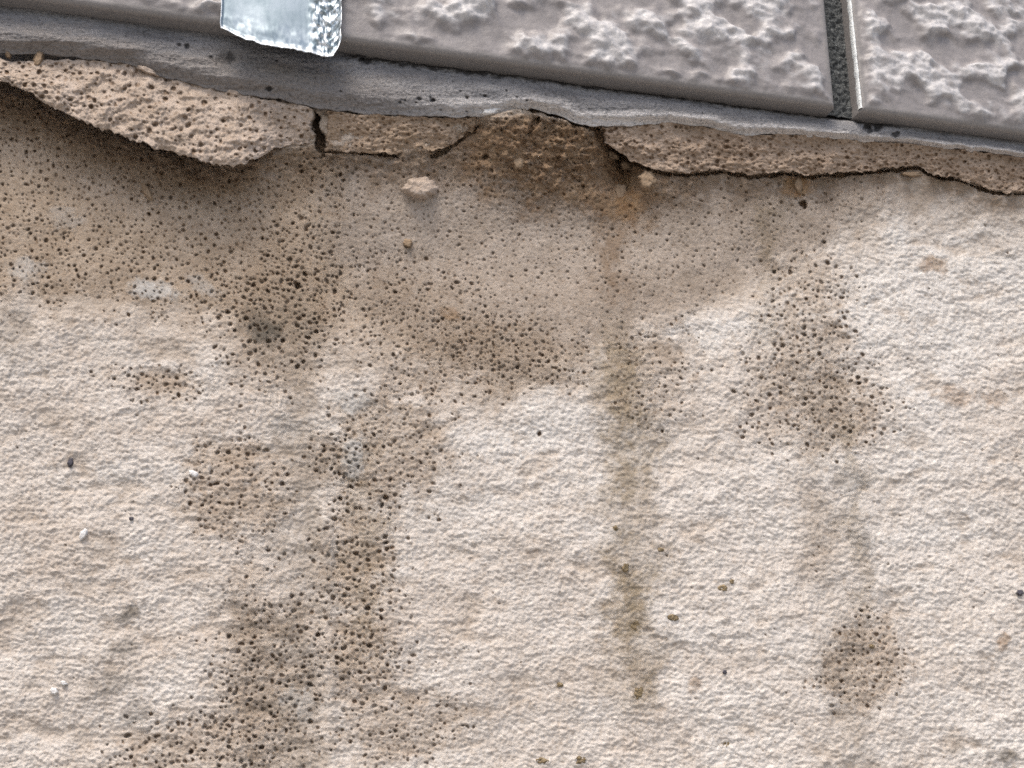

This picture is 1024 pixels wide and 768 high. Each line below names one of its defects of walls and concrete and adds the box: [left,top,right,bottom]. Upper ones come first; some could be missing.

crack [312,114,403,161]
crack [431,127,477,158]
crack [529,109,1024,196]
leakage [134,281,177,299]